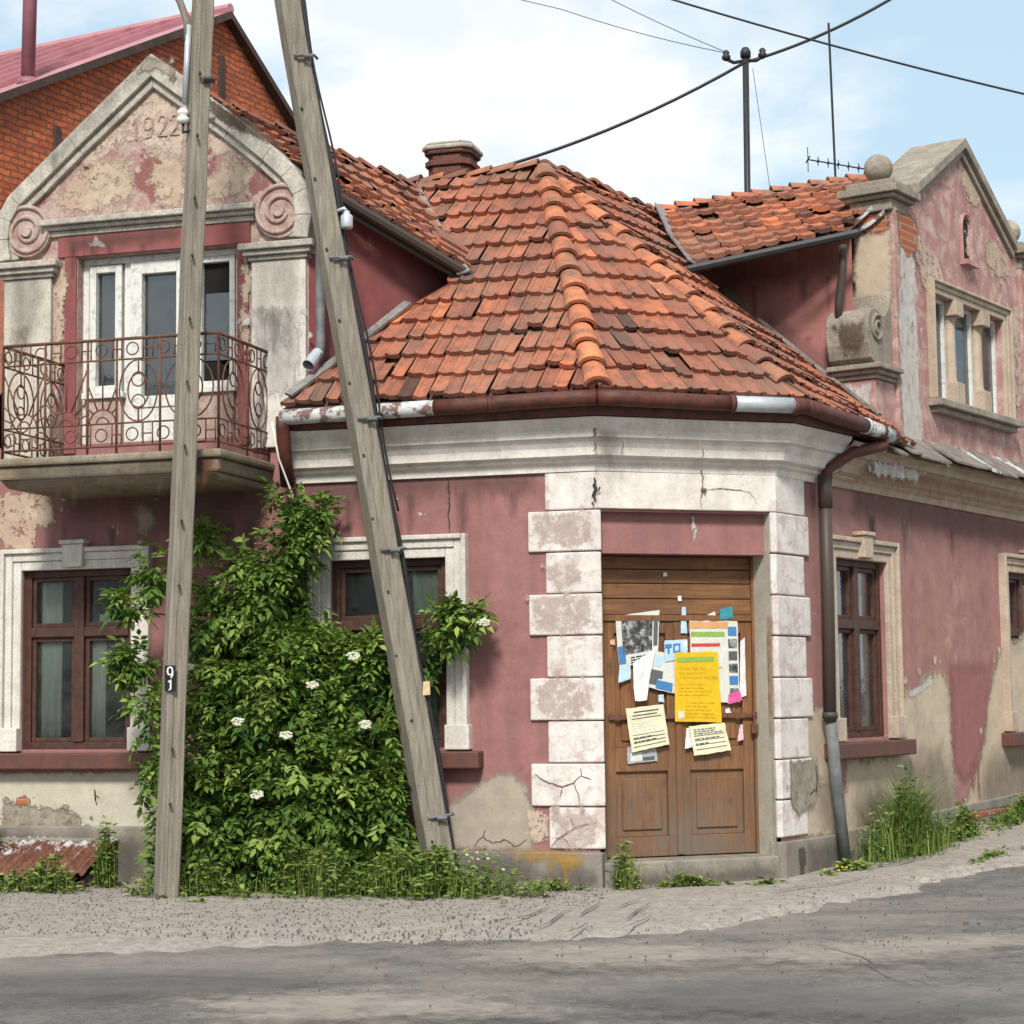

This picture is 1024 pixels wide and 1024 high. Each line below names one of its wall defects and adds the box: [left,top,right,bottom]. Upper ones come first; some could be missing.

peeling [38,89,187,218]
peeling [206,99,281,206]
peeling [964,230,1009,285]
peeling [852,206,944,440]
flaking render [0,492,65,550]
crack [591,477,601,507]
crack [700,448,756,509]
peeling [869,451,925,484]
peeling [787,632,1024,875]
peeling [0,771,157,826]
peeling [448,772,597,852]
crack [474,769,591,847]